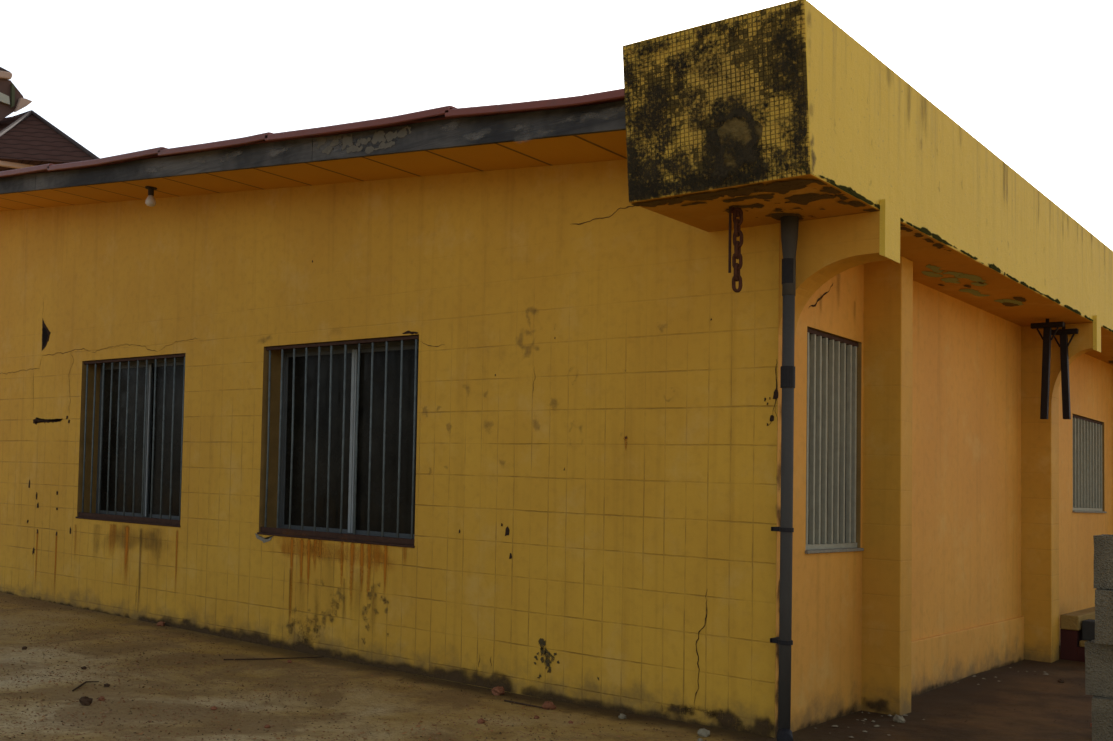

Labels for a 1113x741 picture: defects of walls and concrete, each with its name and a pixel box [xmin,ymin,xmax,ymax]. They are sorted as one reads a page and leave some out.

leakage [567,2,877,212]
crack [576,206,634,225]
peeling [631,179,855,220]
leakage [900,223,951,251]
peeling [922,264,1026,307]
crack [0,338,197,407]
leakage [32,598,778,738]
crack [694,592,707,702]